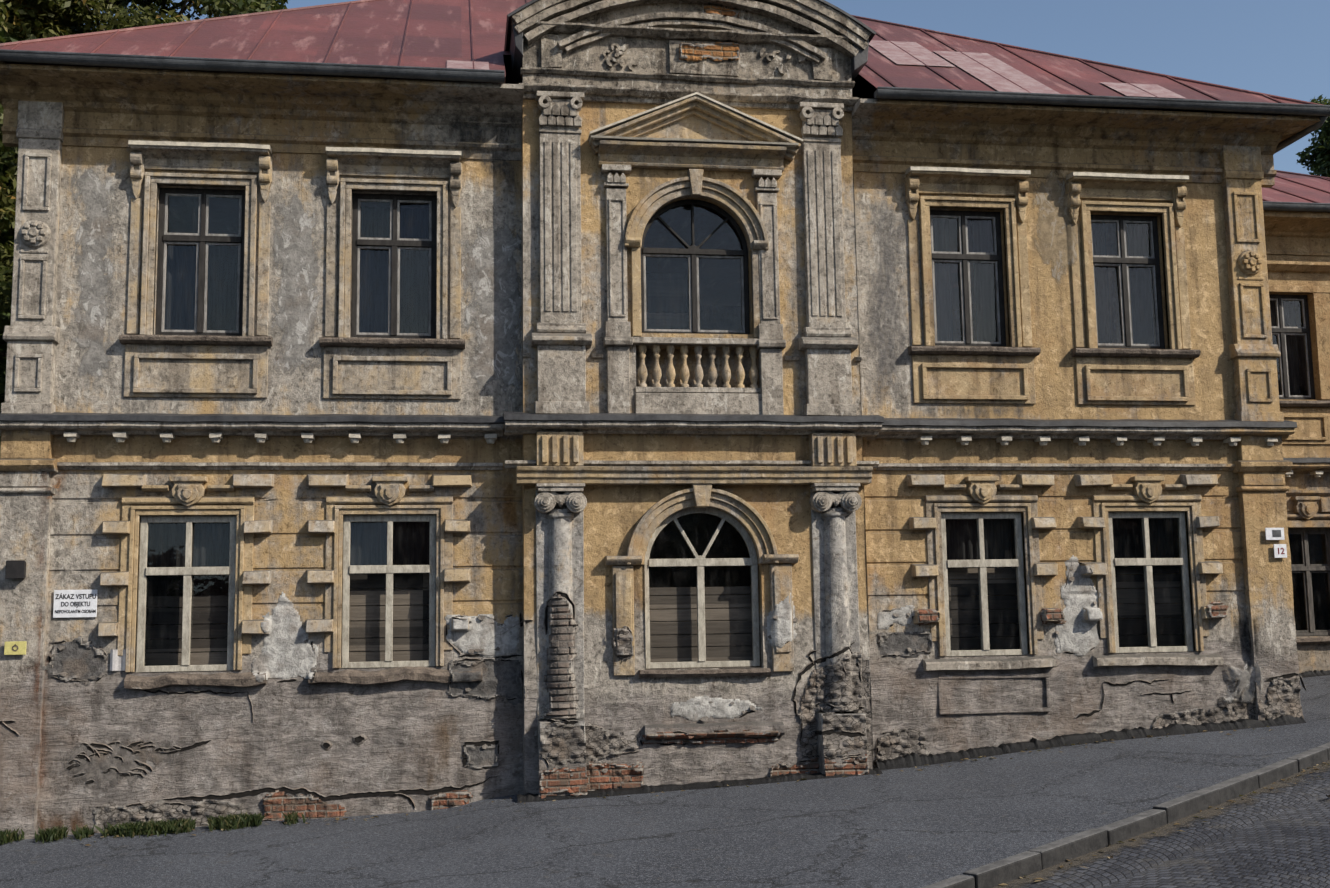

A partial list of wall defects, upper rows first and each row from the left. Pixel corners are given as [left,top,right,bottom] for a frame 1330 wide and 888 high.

peeling [766,593,798,648]
peeling [1040,555,1103,655]
peeling [43,636,108,686]
peeling [445,613,527,705]
flaking render [534,590,780,799]
crack [791,641,862,717]
spalling [770,605,940,777]
spalling [1151,672,1307,729]
peeling [61,739,177,787]
crack [157,740,211,754]
spalling [93,790,346,833]
crack [161,775,499,809]